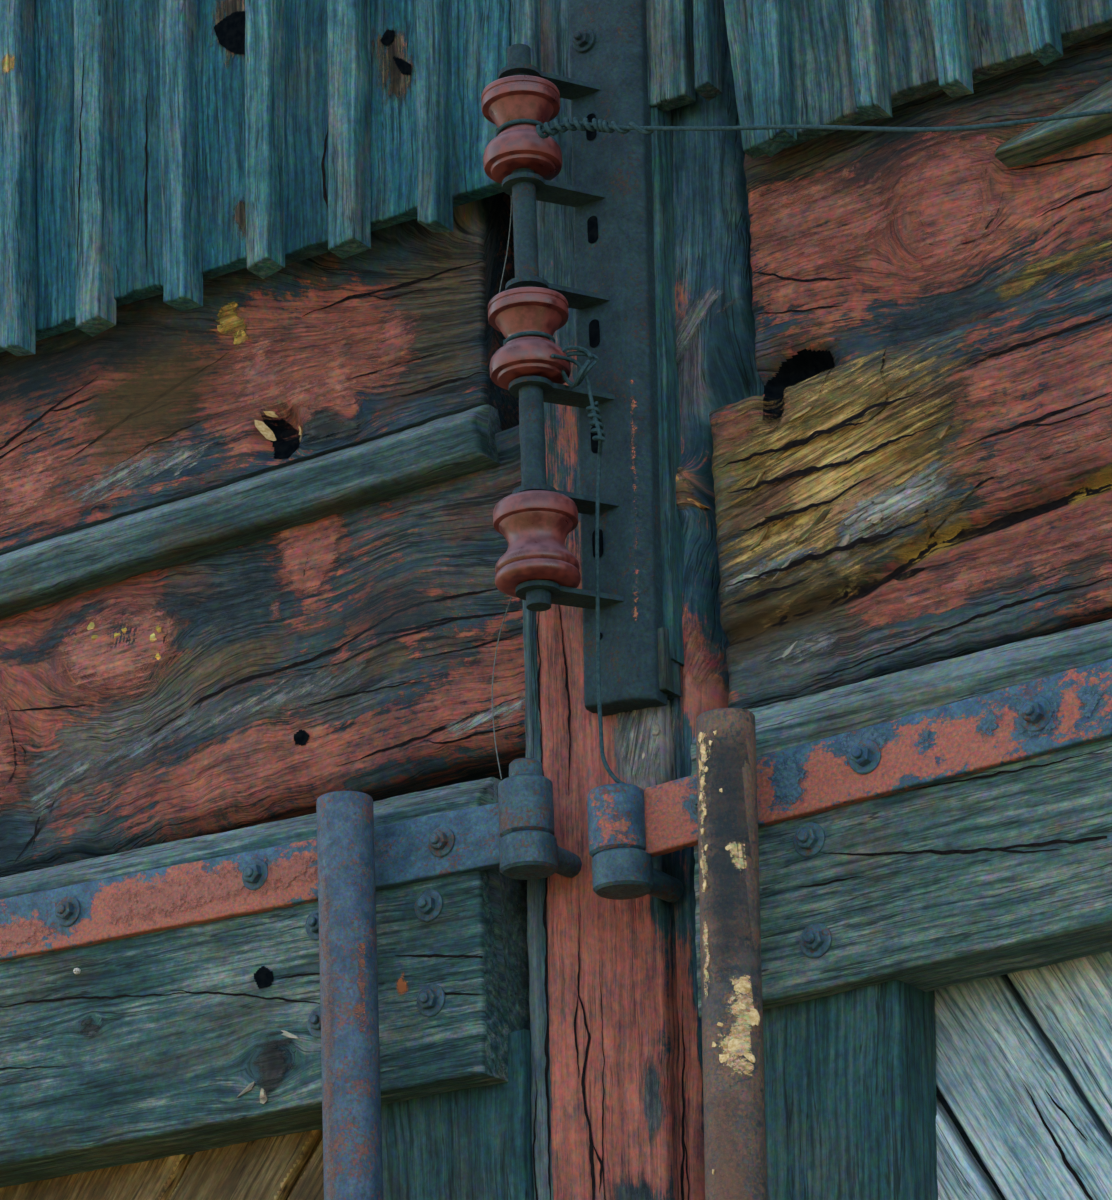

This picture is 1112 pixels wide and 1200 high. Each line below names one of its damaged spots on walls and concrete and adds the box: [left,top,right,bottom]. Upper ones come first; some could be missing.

crack [718,350,1112,648]
peeling [277,513,346,600]
peeling [0,600,138,667]
crack [0,973,320,1007]
corrosion [354,943,365,1032]
crack [533,877,606,1200]
peeling [702,922,710,996]
peeling [712,974,760,1076]
crack [1023,1084,1093,1200]